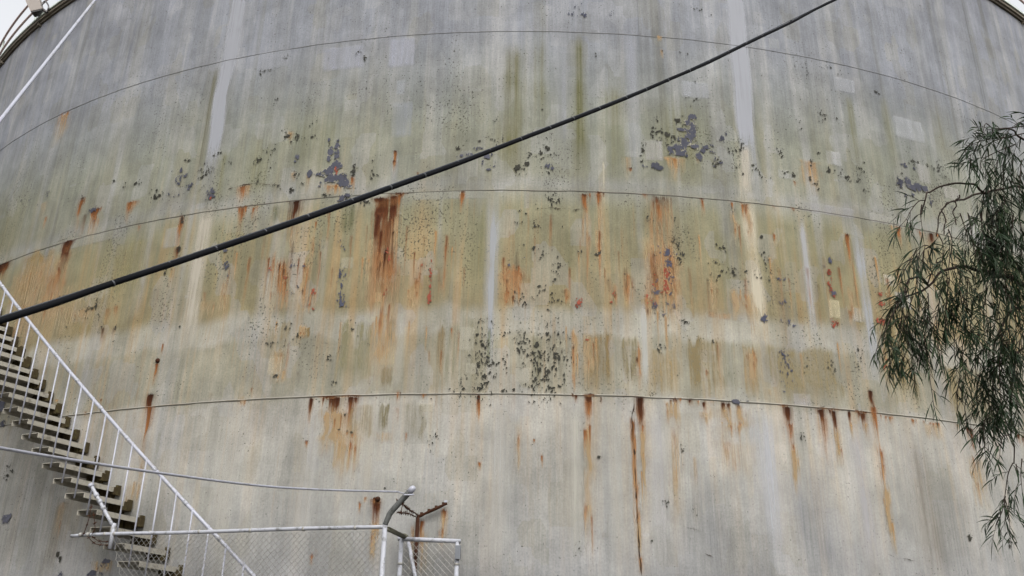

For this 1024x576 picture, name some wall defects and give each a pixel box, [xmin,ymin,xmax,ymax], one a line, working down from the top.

peeling [112,151,232,201]
peeling [251,114,370,206]
peeling [640,97,796,181]
peeling [897,158,947,205]
rust [361,192,421,366]
rust [143,394,154,441]
rust [309,395,357,464]
rust [572,393,602,476]
rust [637,397,646,501]
rust [782,404,799,484]
rust [817,390,893,456]
rust [359,497,380,557]